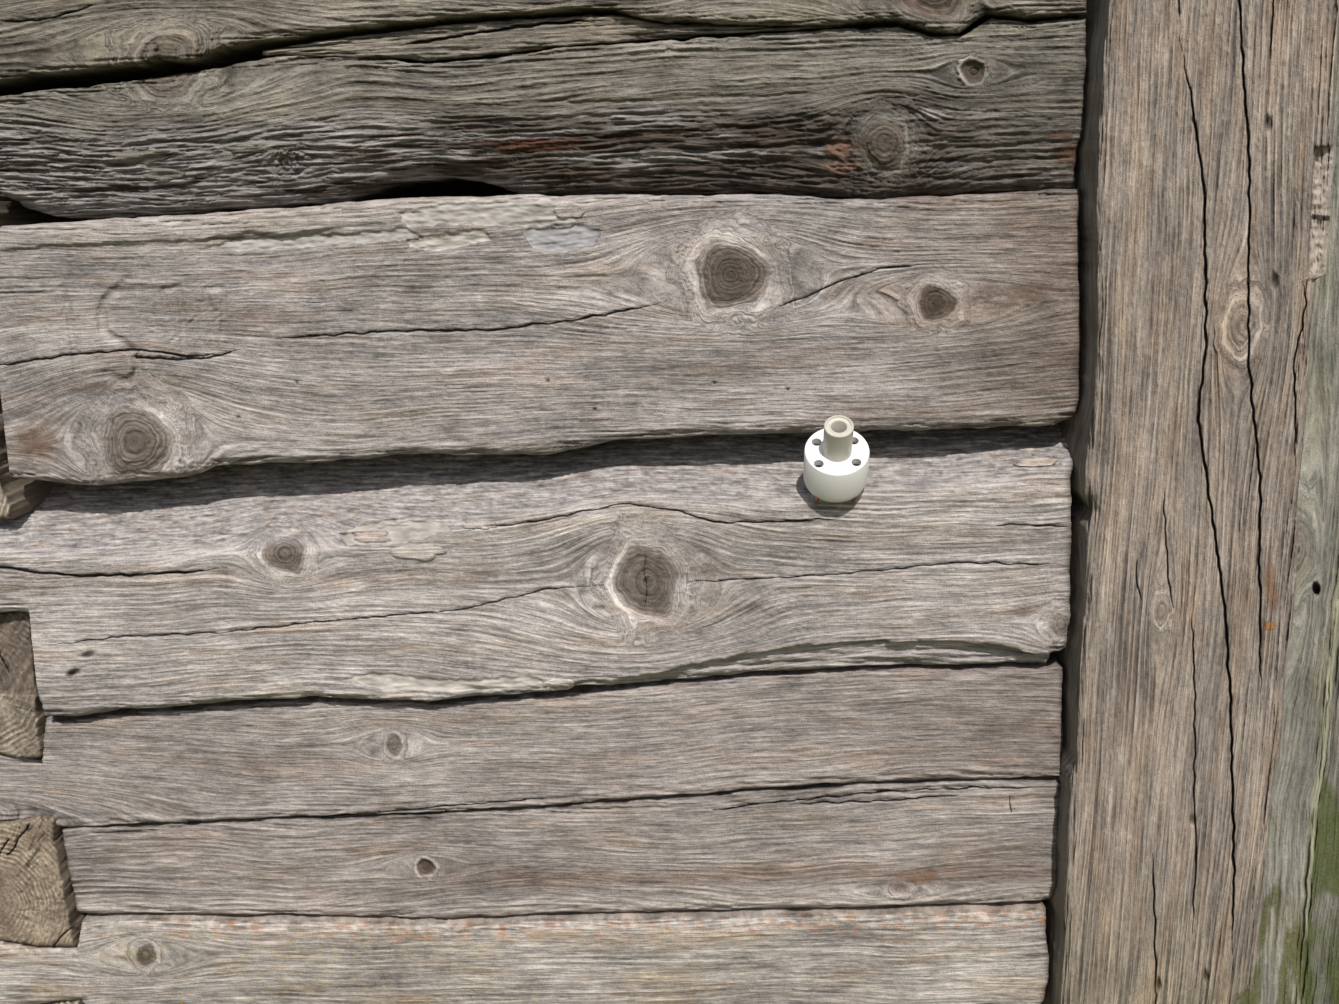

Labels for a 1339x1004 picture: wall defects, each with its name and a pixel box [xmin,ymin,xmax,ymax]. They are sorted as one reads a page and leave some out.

crack [6,349,232,365]
crack [277,303,658,339]
crack [776,264,921,307]
crack [1293,284,1307,460]
crack [1179,0,1274,962]
crack [689,561,1059,582]
crack [1136,493,1197,934]
crack [1150,854,1158,1002]